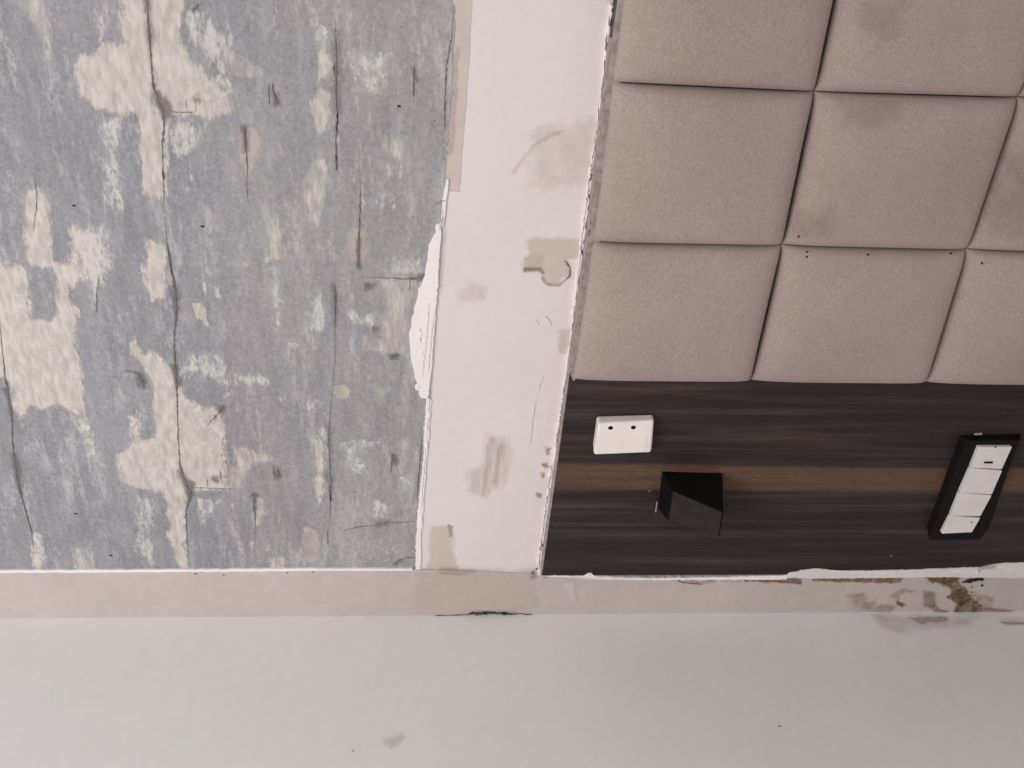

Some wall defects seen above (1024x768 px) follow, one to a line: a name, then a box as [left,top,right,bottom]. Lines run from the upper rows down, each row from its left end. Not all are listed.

flaking render [434,179,449,231]
flaking render [536,4,613,575]
crack [436,609,532,617]